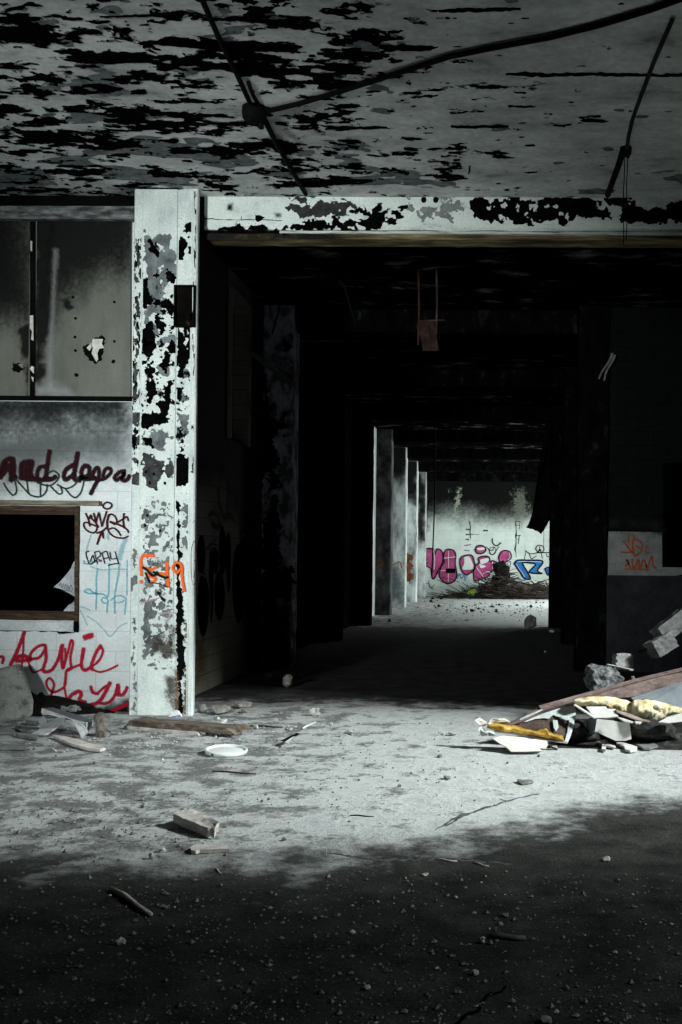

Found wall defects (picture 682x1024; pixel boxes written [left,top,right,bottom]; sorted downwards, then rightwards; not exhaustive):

peeling [0,0,682,716]
crack [436,793,540,830]